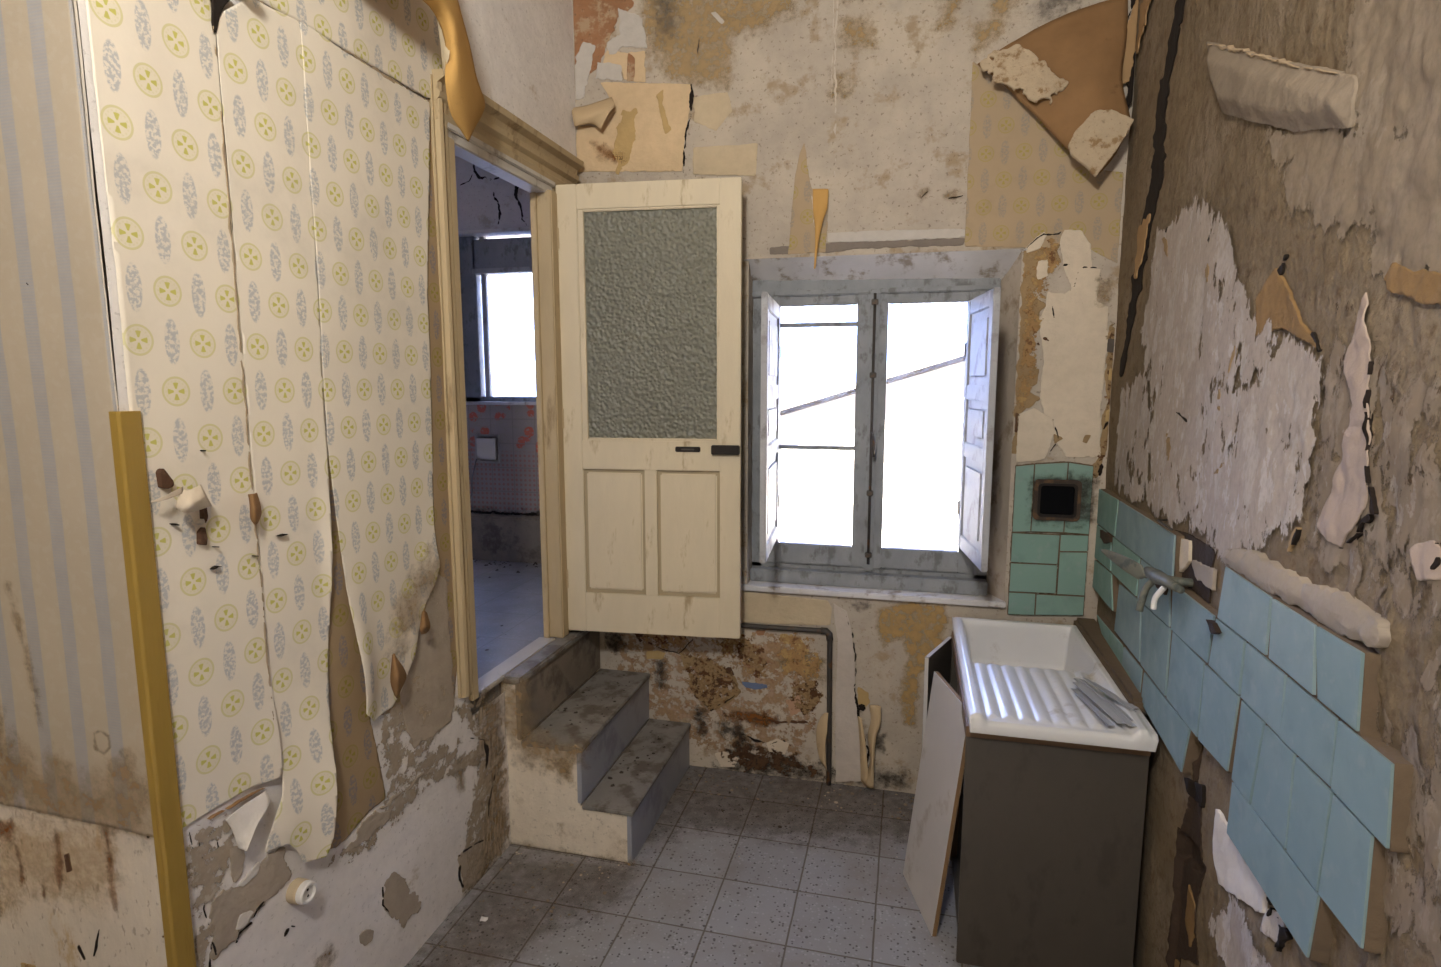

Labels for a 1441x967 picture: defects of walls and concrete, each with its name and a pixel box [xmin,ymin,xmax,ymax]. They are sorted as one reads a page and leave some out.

spalling [572,0,647,129]
peeling [978,0,1139,174]
crack [461,164,527,226]
spalling [1012,232,1063,462]
peeling [1083,196,1441,642]
water stain [605,632,625,653]
spalling [186,791,292,967]
spalling [382,872,421,929]
flaking render [328,573,510,893]
water stain [695,709,836,781]
water stain [878,773,906,787]
spalling [1165,740,1284,967]